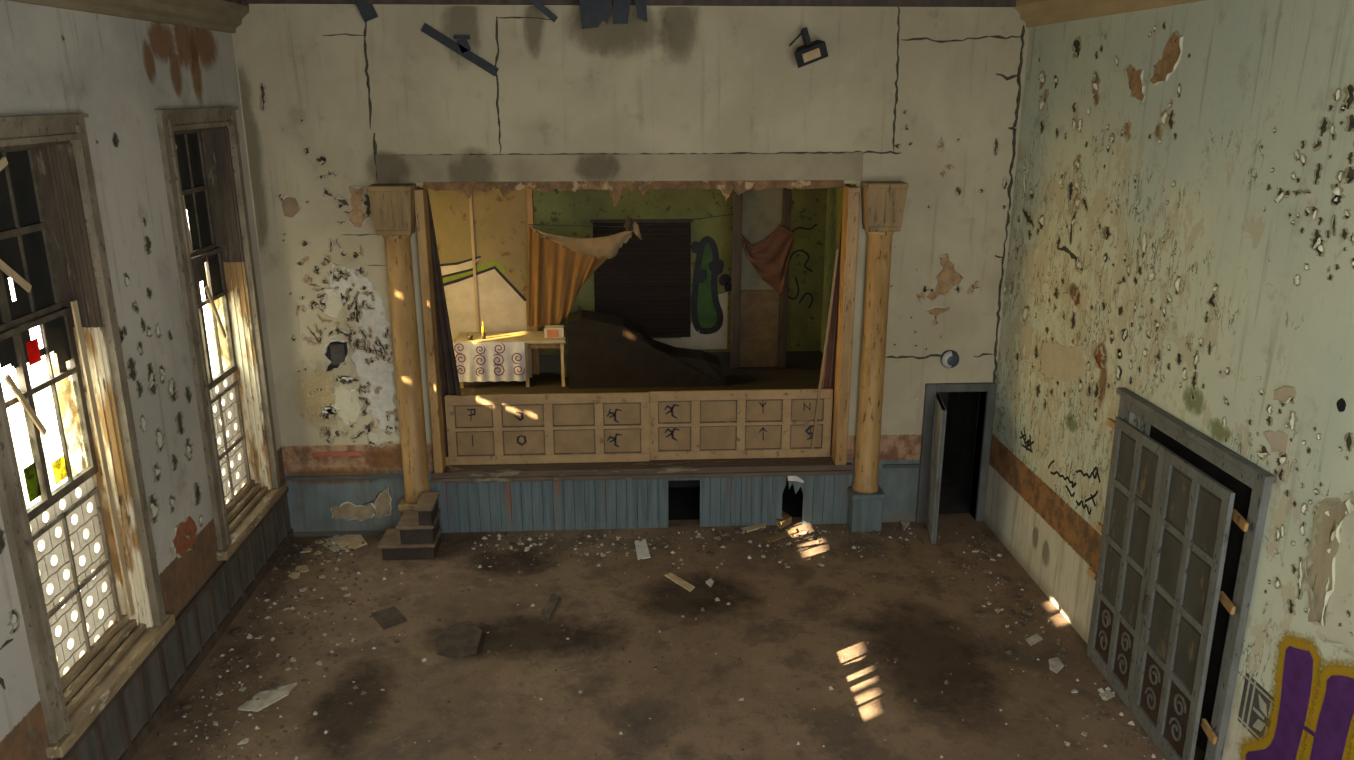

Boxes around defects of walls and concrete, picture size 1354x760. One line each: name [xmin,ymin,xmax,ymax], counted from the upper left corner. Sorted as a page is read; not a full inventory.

peeling [258,83,268,111]
crack [322,7,1025,382]
peeling [936,136,985,196]
peeling [992,138,1001,156]
peeling [1001,164,1045,253]
peeling [1015,21,1220,421]
peeling [1263,84,1354,286]
flaking render [275,147,400,448]
flaking render [909,253,981,350]
flaking render [330,487,392,521]
flaking render [1247,376,1354,657]